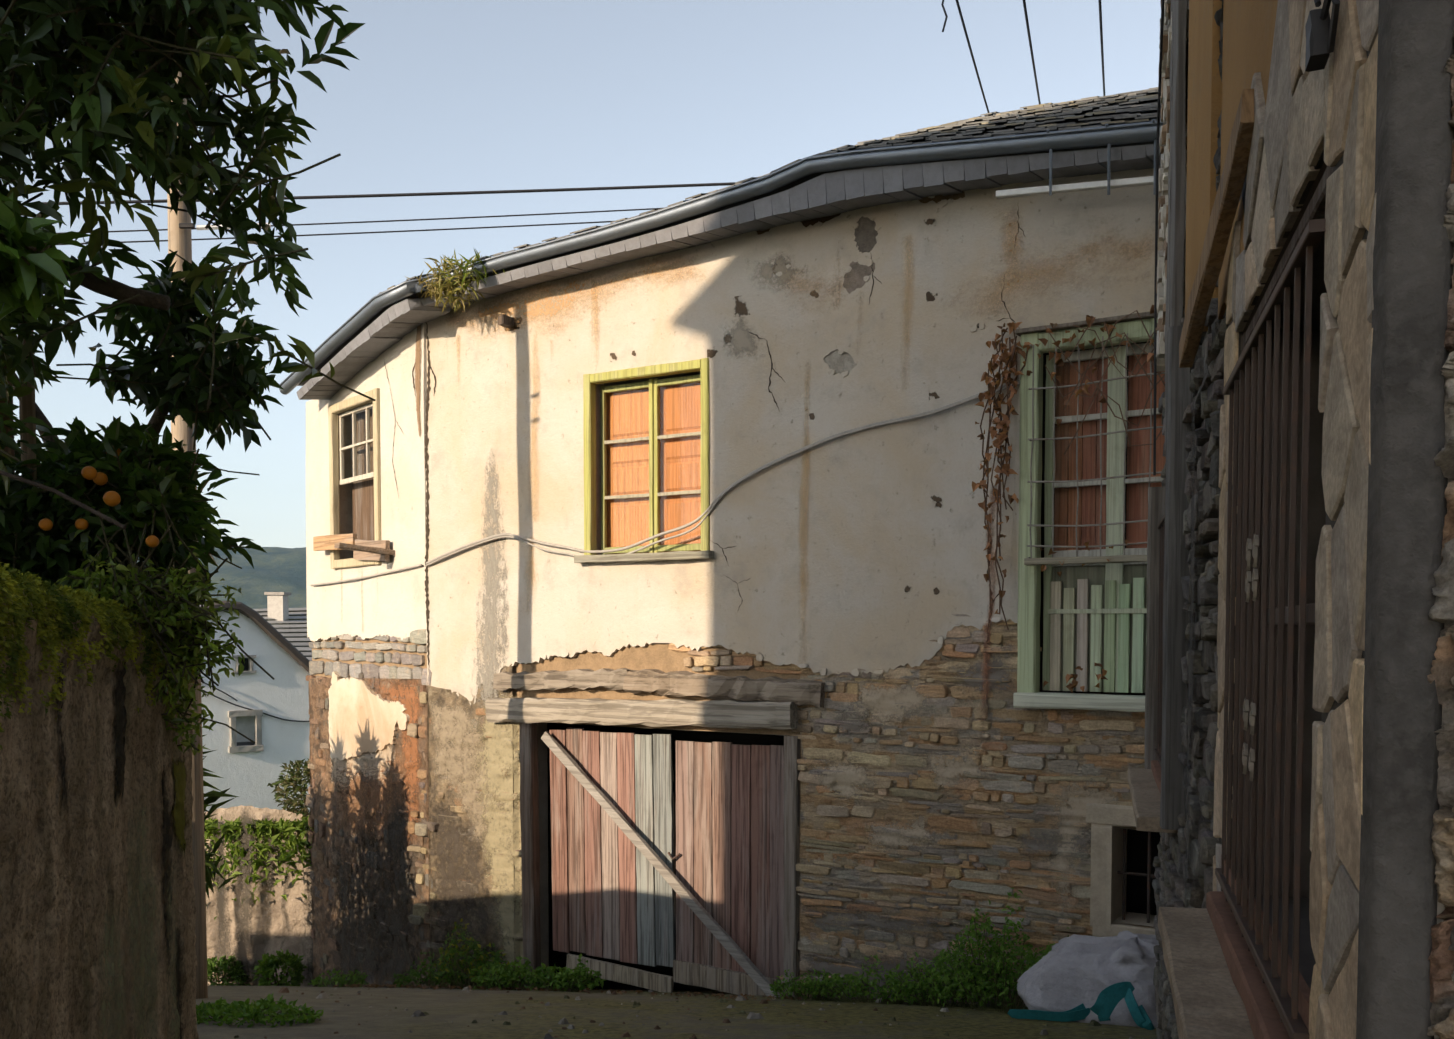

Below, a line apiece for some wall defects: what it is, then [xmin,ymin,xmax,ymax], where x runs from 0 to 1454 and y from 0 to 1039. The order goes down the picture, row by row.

peeling [707,296,755,358]
crack [749,332,785,409]
spalling [824,349,857,377]
spalling [801,213,881,294]
water stain [477,463,508,705]
water stain [57,661,68,810]
water stain [114,662,127,805]
water stain [161,759,189,1039]
flaking render [328,664,523,989]
flaking render [668,614,1145,1007]